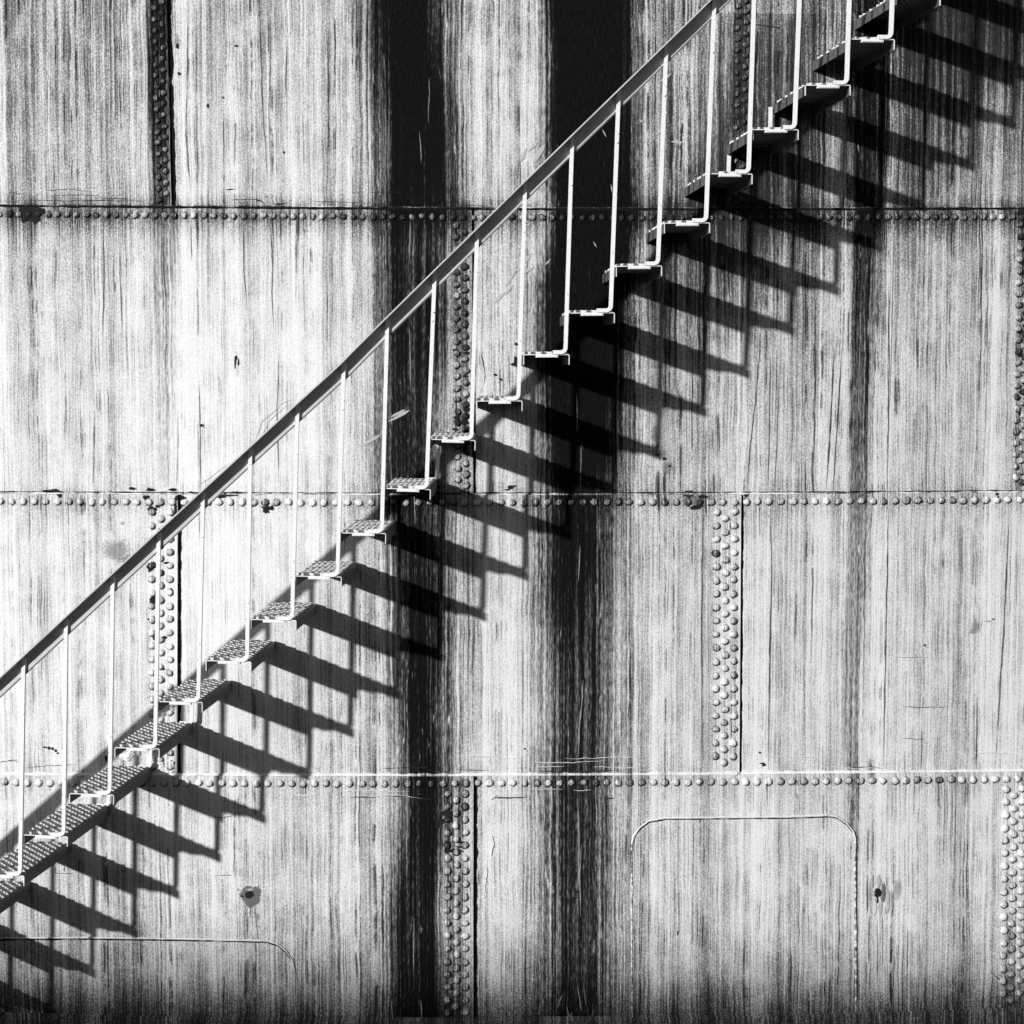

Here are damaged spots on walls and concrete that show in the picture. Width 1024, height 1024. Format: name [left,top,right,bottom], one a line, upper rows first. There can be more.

water stain [356,0,467,327]
water stain [371,273,469,1019]
water stain [530,0,826,1017]